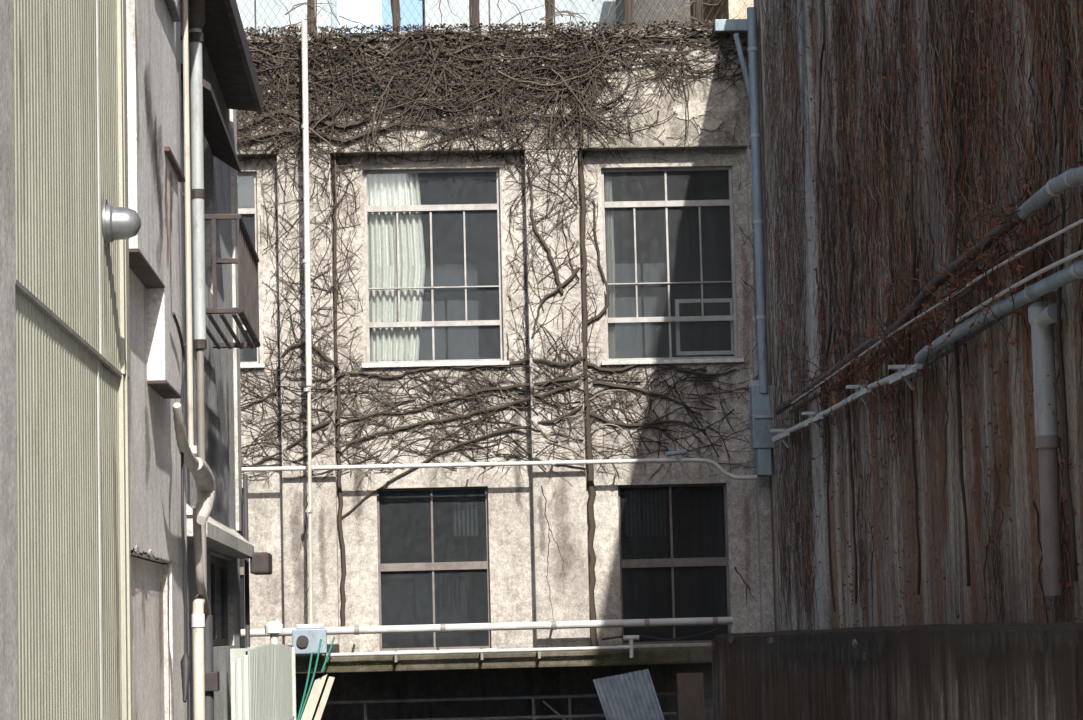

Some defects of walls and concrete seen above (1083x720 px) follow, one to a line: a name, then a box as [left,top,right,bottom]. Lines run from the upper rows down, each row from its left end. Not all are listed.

leakage [145,78,162,173]
peeling [566,81,664,125]
peeling [672,98,723,131]
leakage [205,351,229,477]